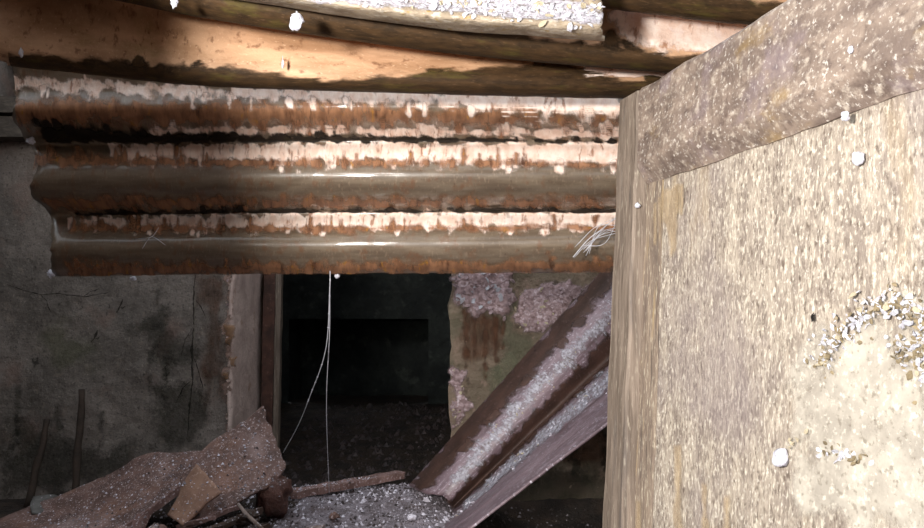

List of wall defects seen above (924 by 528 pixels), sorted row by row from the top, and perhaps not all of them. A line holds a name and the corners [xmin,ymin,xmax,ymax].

corrosion [15,95,578,138]
corrosion [590,114,618,132]
corrosion [33,144,323,169]
corrosion [336,148,617,169]
crack [177,274,205,433]
corrosion [64,256,613,432]